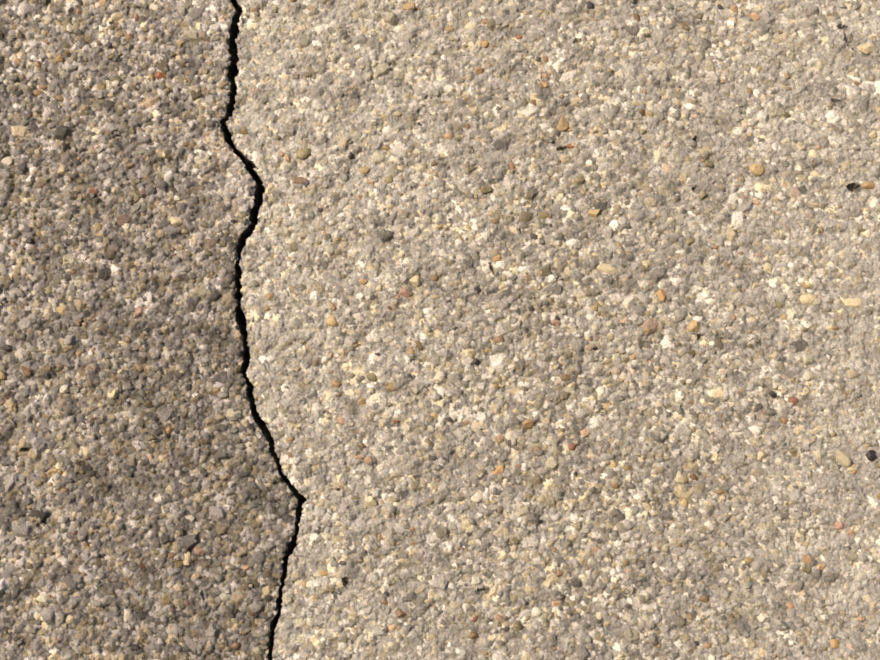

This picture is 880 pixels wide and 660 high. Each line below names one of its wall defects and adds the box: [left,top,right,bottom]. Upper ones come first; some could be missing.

crack [219,0,307,660]